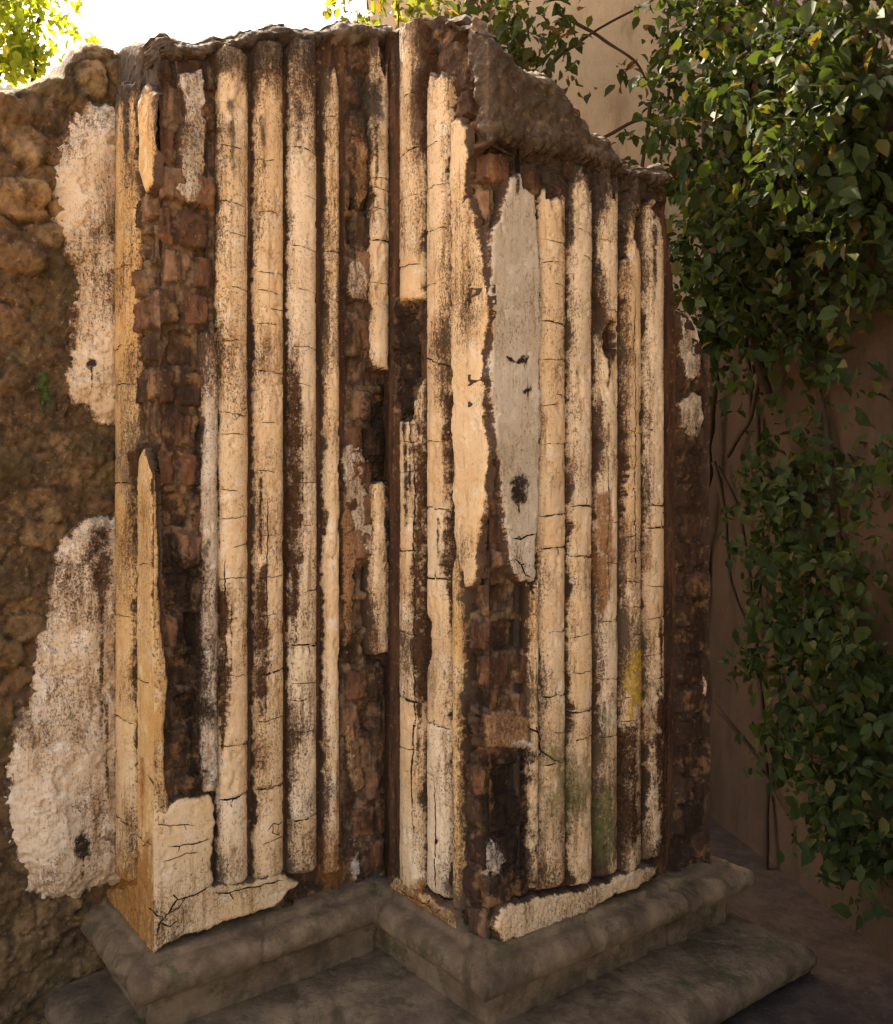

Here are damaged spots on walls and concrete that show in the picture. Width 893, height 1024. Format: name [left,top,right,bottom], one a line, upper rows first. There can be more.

spalling [343,43,385,278]
spalling [131,57,217,800]
water stain [283,358,304,649]
spalling [274,291,422,908]
spalling [452,483,527,725]
crack [512,287,664,766]
spalling [667,309,707,873]
crack [116,815,211,862]
crack [148,880,281,938]
crack [263,812,317,845]
spalling [449,746,535,939]